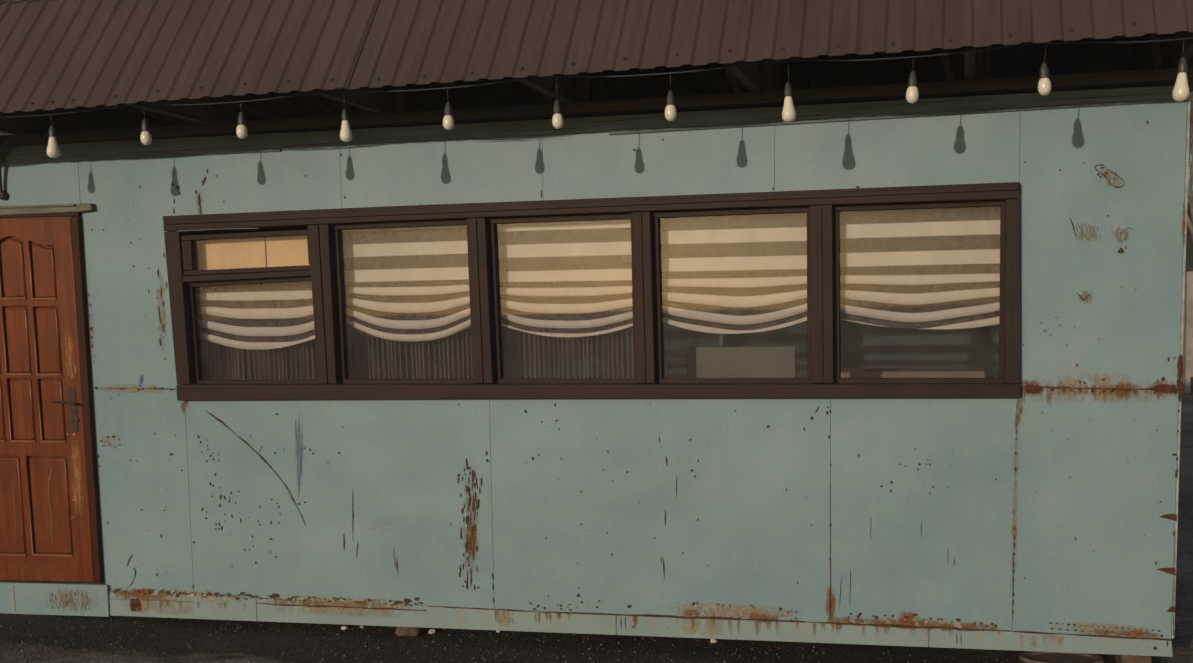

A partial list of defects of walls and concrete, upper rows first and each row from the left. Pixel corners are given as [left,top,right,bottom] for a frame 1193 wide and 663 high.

rust [1015,356,1183,471]
rust [108,510,1177,650]